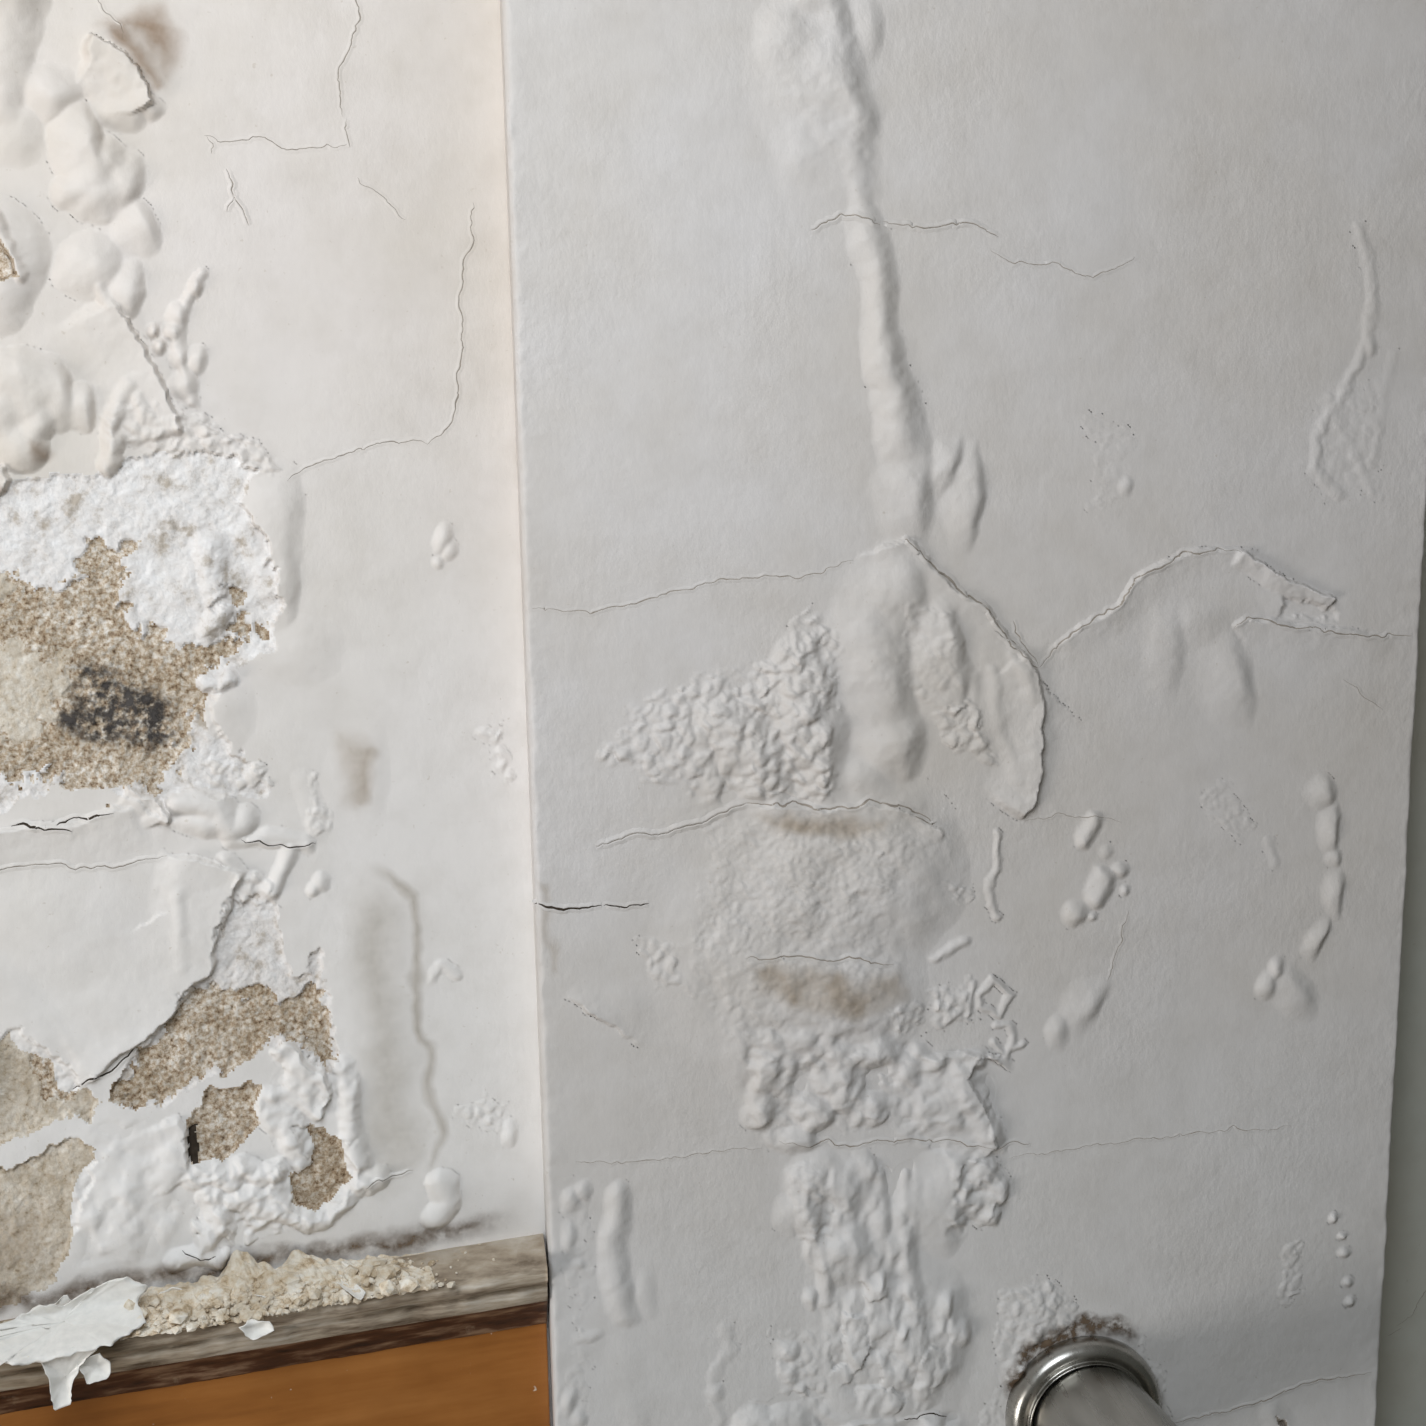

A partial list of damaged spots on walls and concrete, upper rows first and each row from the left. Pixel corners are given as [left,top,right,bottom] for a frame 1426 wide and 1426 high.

crack [204,0,406,227]
crack [810,209,1137,281]
crack [285,202,478,483]
crack [532,557,853,617]
crack [904,535,1242,671]
crack [1231,613,1412,642]
crack [0,809,167,874]
spalling [0,409,376,1308]
crack [239,836,317,852]
peeling [963,1155,1013,1231]
peeling [239,1319,274,1340]